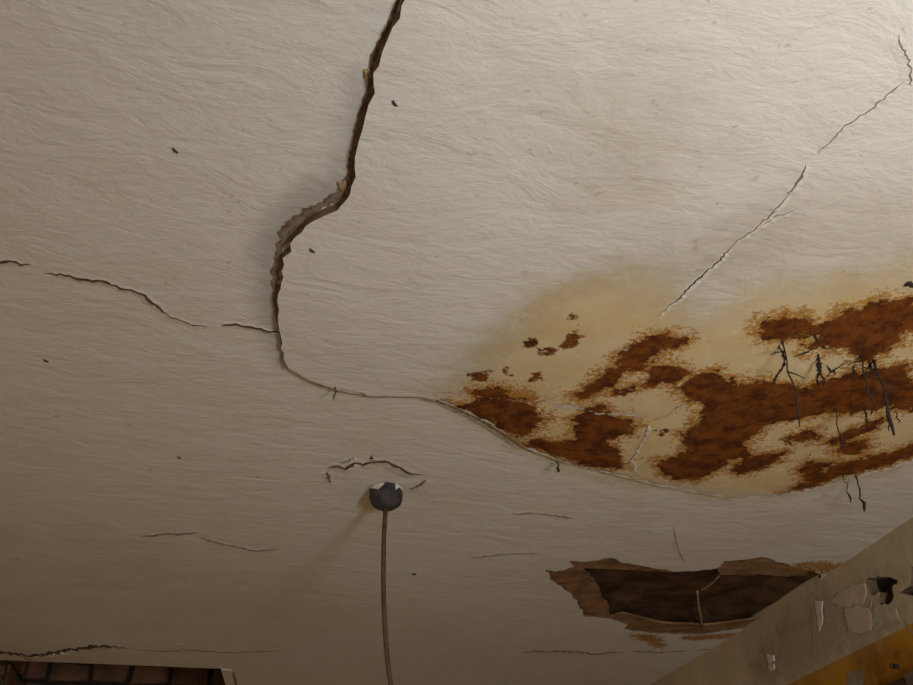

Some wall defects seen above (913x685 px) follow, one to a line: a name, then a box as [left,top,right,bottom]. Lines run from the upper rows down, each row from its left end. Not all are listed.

crack [657,35,913,317]
crack [0,0,526,451]
rust [422,270,913,497]
crack [321,455,429,490]
crack [547,402,686,474]
crack [141,531,283,552]
flaking render [547,557,819,633]
crack [0,642,281,660]